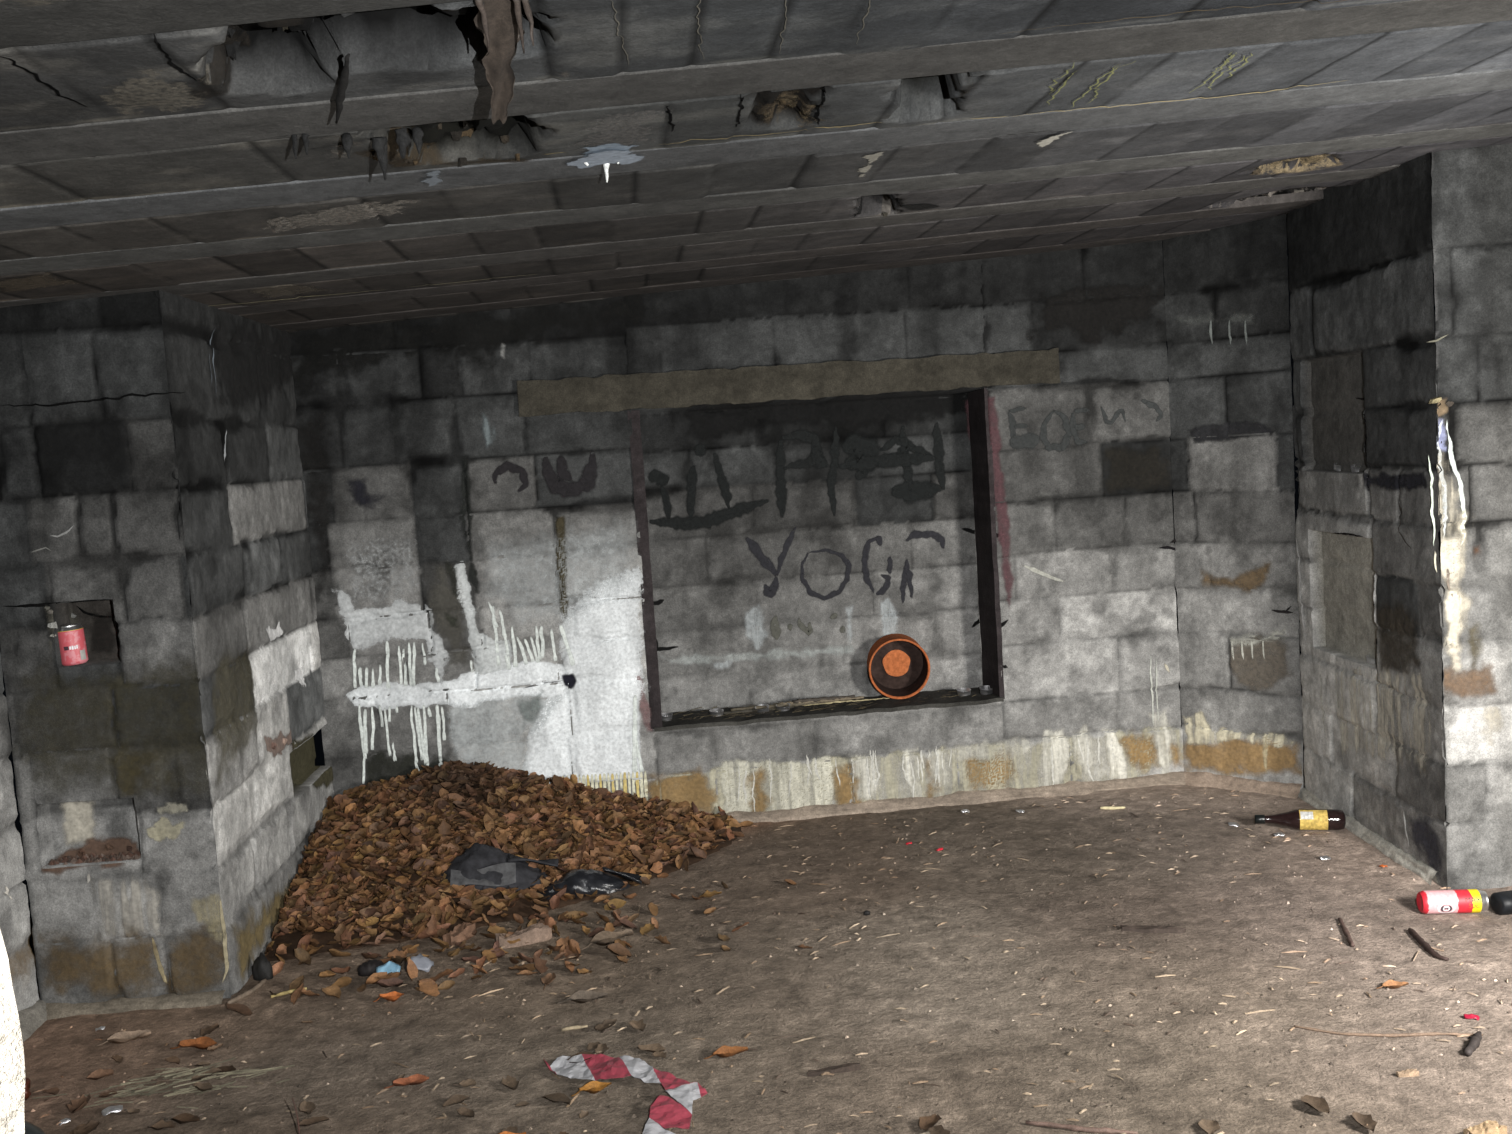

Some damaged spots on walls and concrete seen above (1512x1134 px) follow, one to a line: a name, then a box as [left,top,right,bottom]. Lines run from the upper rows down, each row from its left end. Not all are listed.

spalling [191,18,314,100]
spalling [357,121,528,167]
spalling [1252,154,1341,193]
damp [521,698,540,720]
damp [674,659,1293,814]
damp [87,874,167,983]
damp [198,896,229,982]